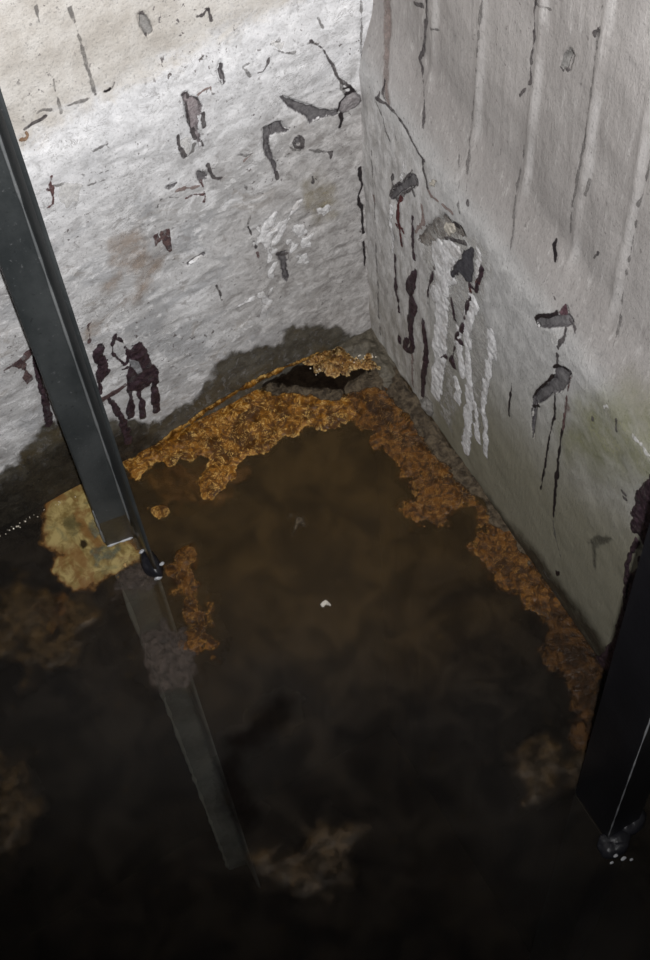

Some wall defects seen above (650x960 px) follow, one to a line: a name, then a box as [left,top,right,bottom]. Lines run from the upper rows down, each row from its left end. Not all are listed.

crack [475,2,483,57]
corrosion [4,348,53,427]
corrosion [87,323,160,445]
spalling [176,63,226,159]
leakage [109,325,355,462]
spalling [263,121,333,180]
spalling [280,86,362,128]
crack [309,0,474,335]
corrosion [388,195,404,254]
spalling [418,214,484,346]
leakage [415,204,497,458]
leakage [0,421,82,558]